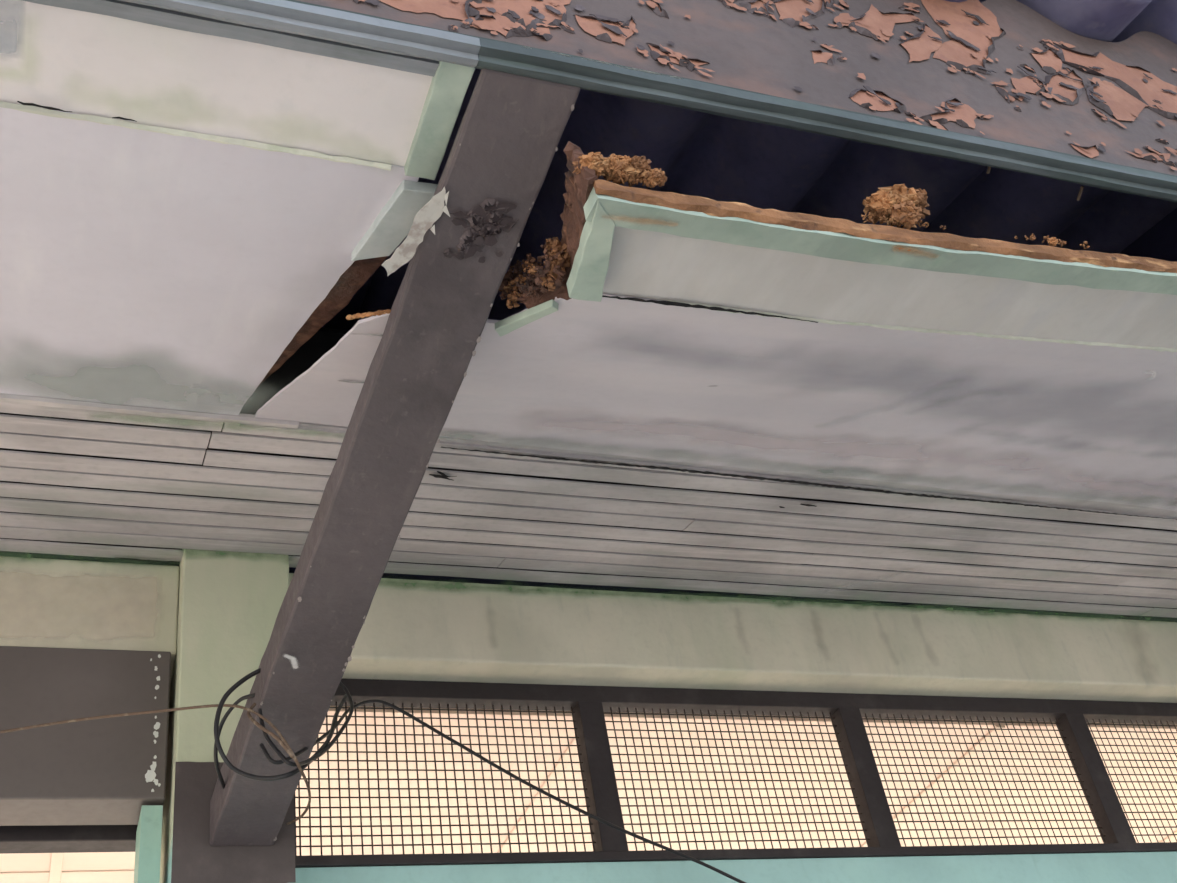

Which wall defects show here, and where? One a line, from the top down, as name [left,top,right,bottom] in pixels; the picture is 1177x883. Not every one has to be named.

peeling [353,0,715,78]
peeling [718,0,1177,170]
spalling [346,309,391,320]
peeling [145,716,161,792]